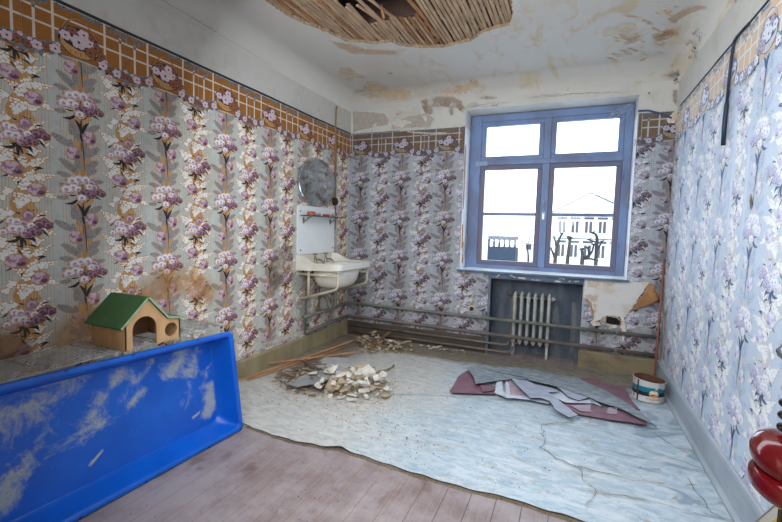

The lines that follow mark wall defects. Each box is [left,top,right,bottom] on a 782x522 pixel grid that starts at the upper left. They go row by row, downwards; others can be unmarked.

flaking render [353,112,446,134]
spalling [600,315,621,329]